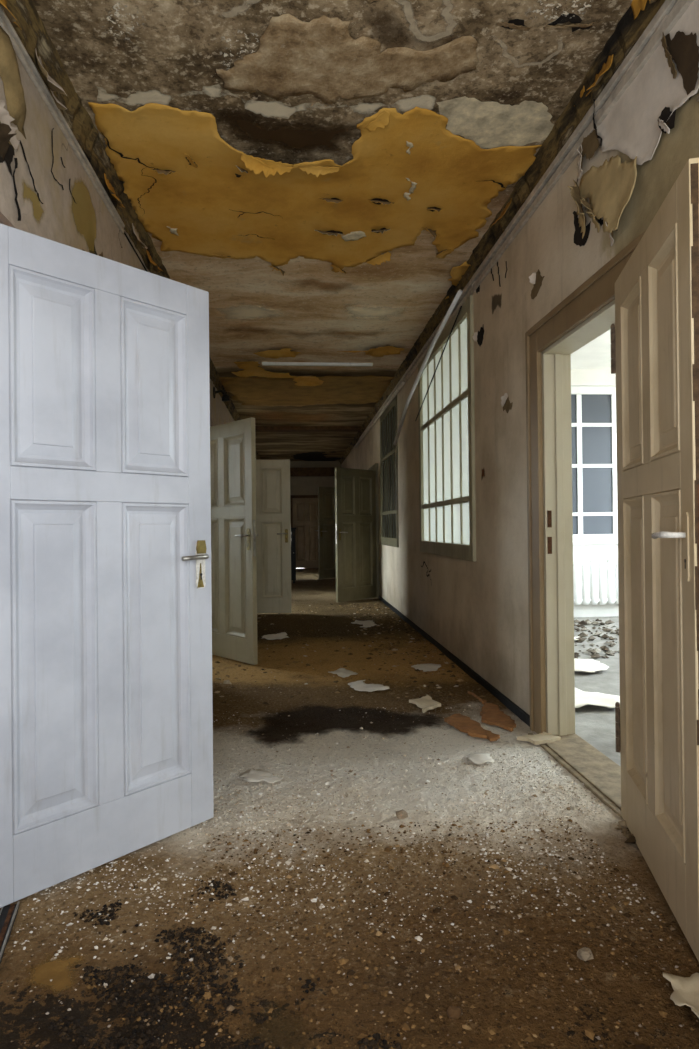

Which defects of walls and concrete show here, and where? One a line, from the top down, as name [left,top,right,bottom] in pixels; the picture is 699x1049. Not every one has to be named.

water stain [106,2,143,39]
water stain [223,0,259,17]
water stain [373,0,456,47]
water stain [532,0,592,20]
water stain [221,30,259,69]
water stain [97,84,435,119]
flaking render [216,14,479,104]
peeling [580,0,699,165]
peeling [0,94,20,175]
peeling [88,96,554,299]